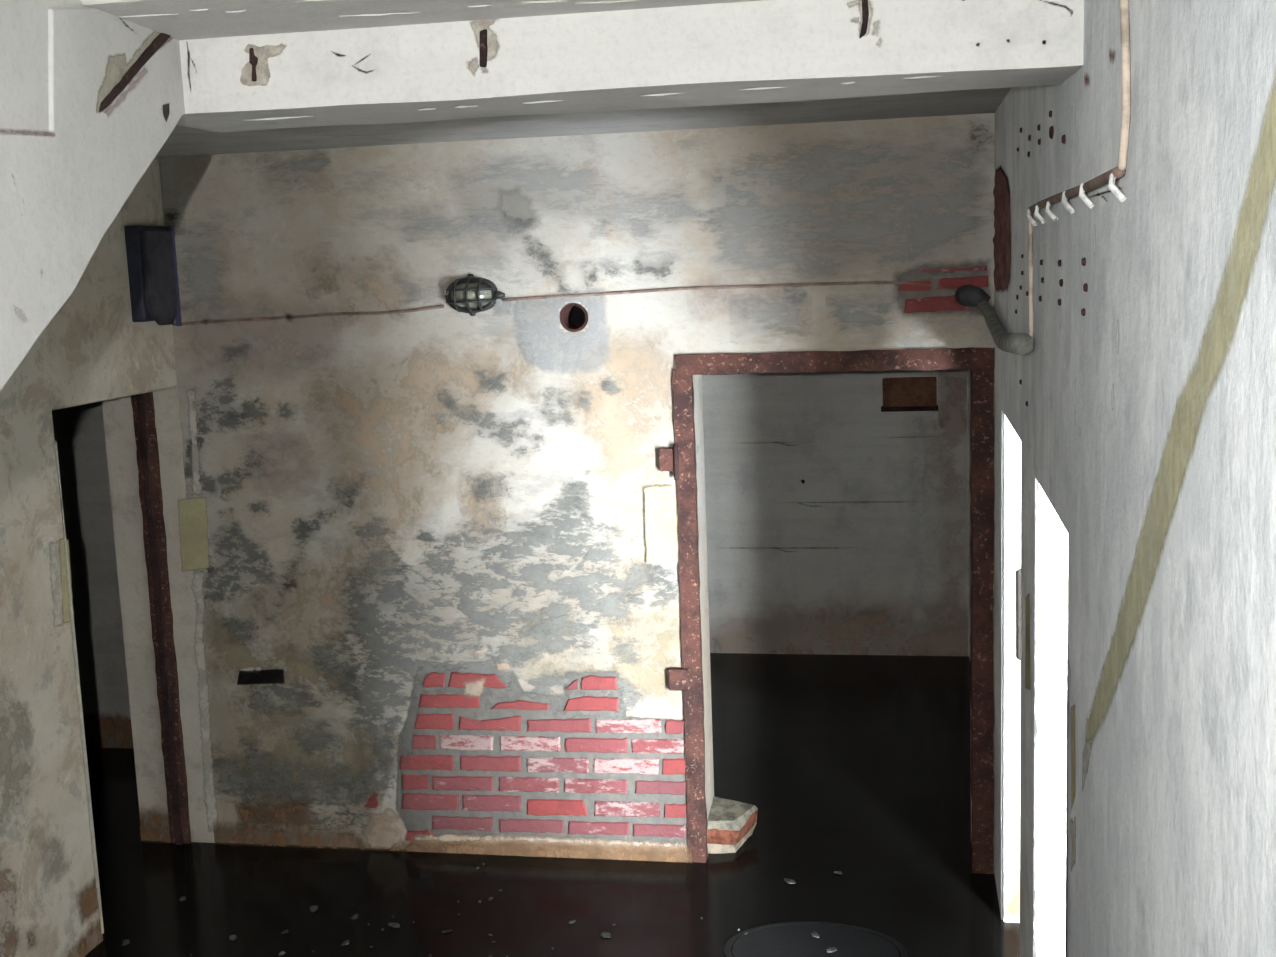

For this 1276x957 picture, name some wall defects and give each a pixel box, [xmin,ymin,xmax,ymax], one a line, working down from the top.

spalling [240,44,285,86]
spalling [468,19,499,73]
spalling [847,0,881,45]
flaking render [896,167,1011,315]
water stain [316,347,529,533]
water stain [574,339,674,514]
water stain [735,521,968,656]
flaking render [55,442,104,933]
water stain [208,534,692,863]
flaking render [249,471,687,857]
water stain [68,878,105,957]